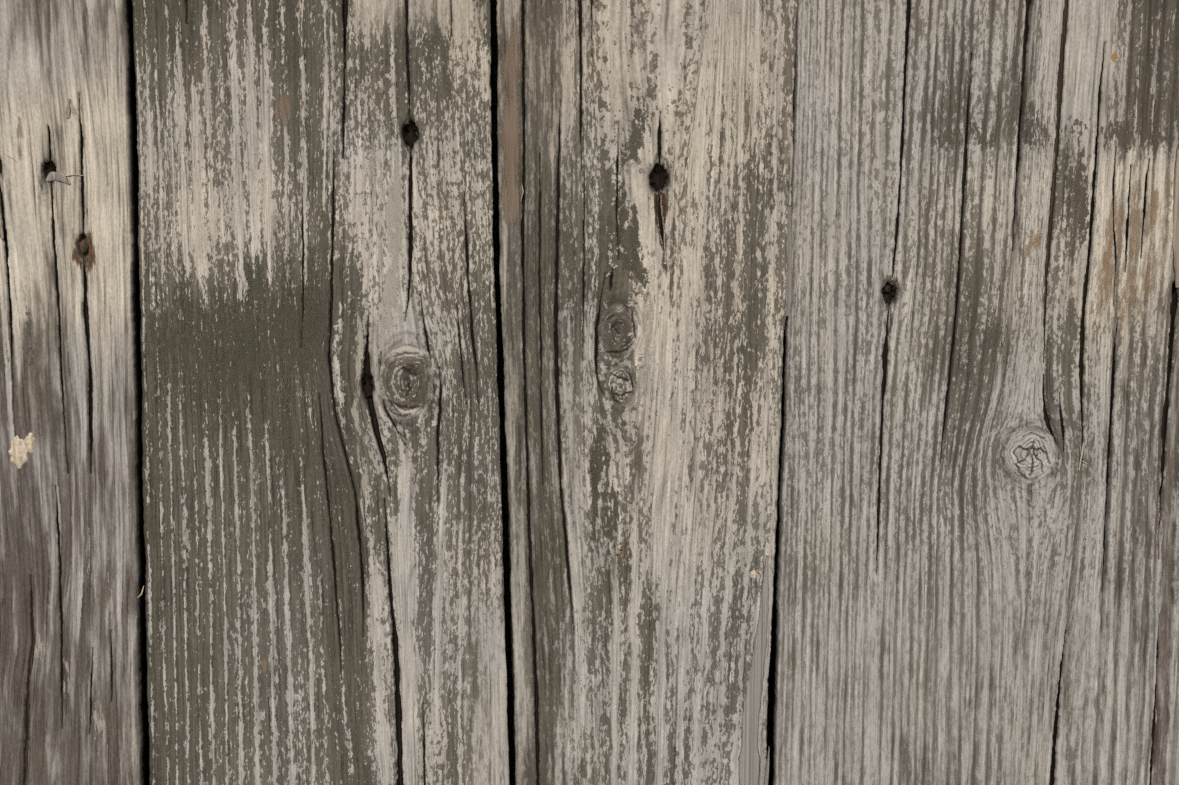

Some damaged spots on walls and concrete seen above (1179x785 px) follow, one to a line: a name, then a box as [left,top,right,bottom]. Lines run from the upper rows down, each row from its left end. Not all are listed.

crack [301,0,479,785]
peeling [501,19,519,226]
crack [657,111,665,262]
crack [876,0,911,573]
crack [1012,0,1031,252]
crack [1042,0,1150,588]
crack [1159,280,1178,524]